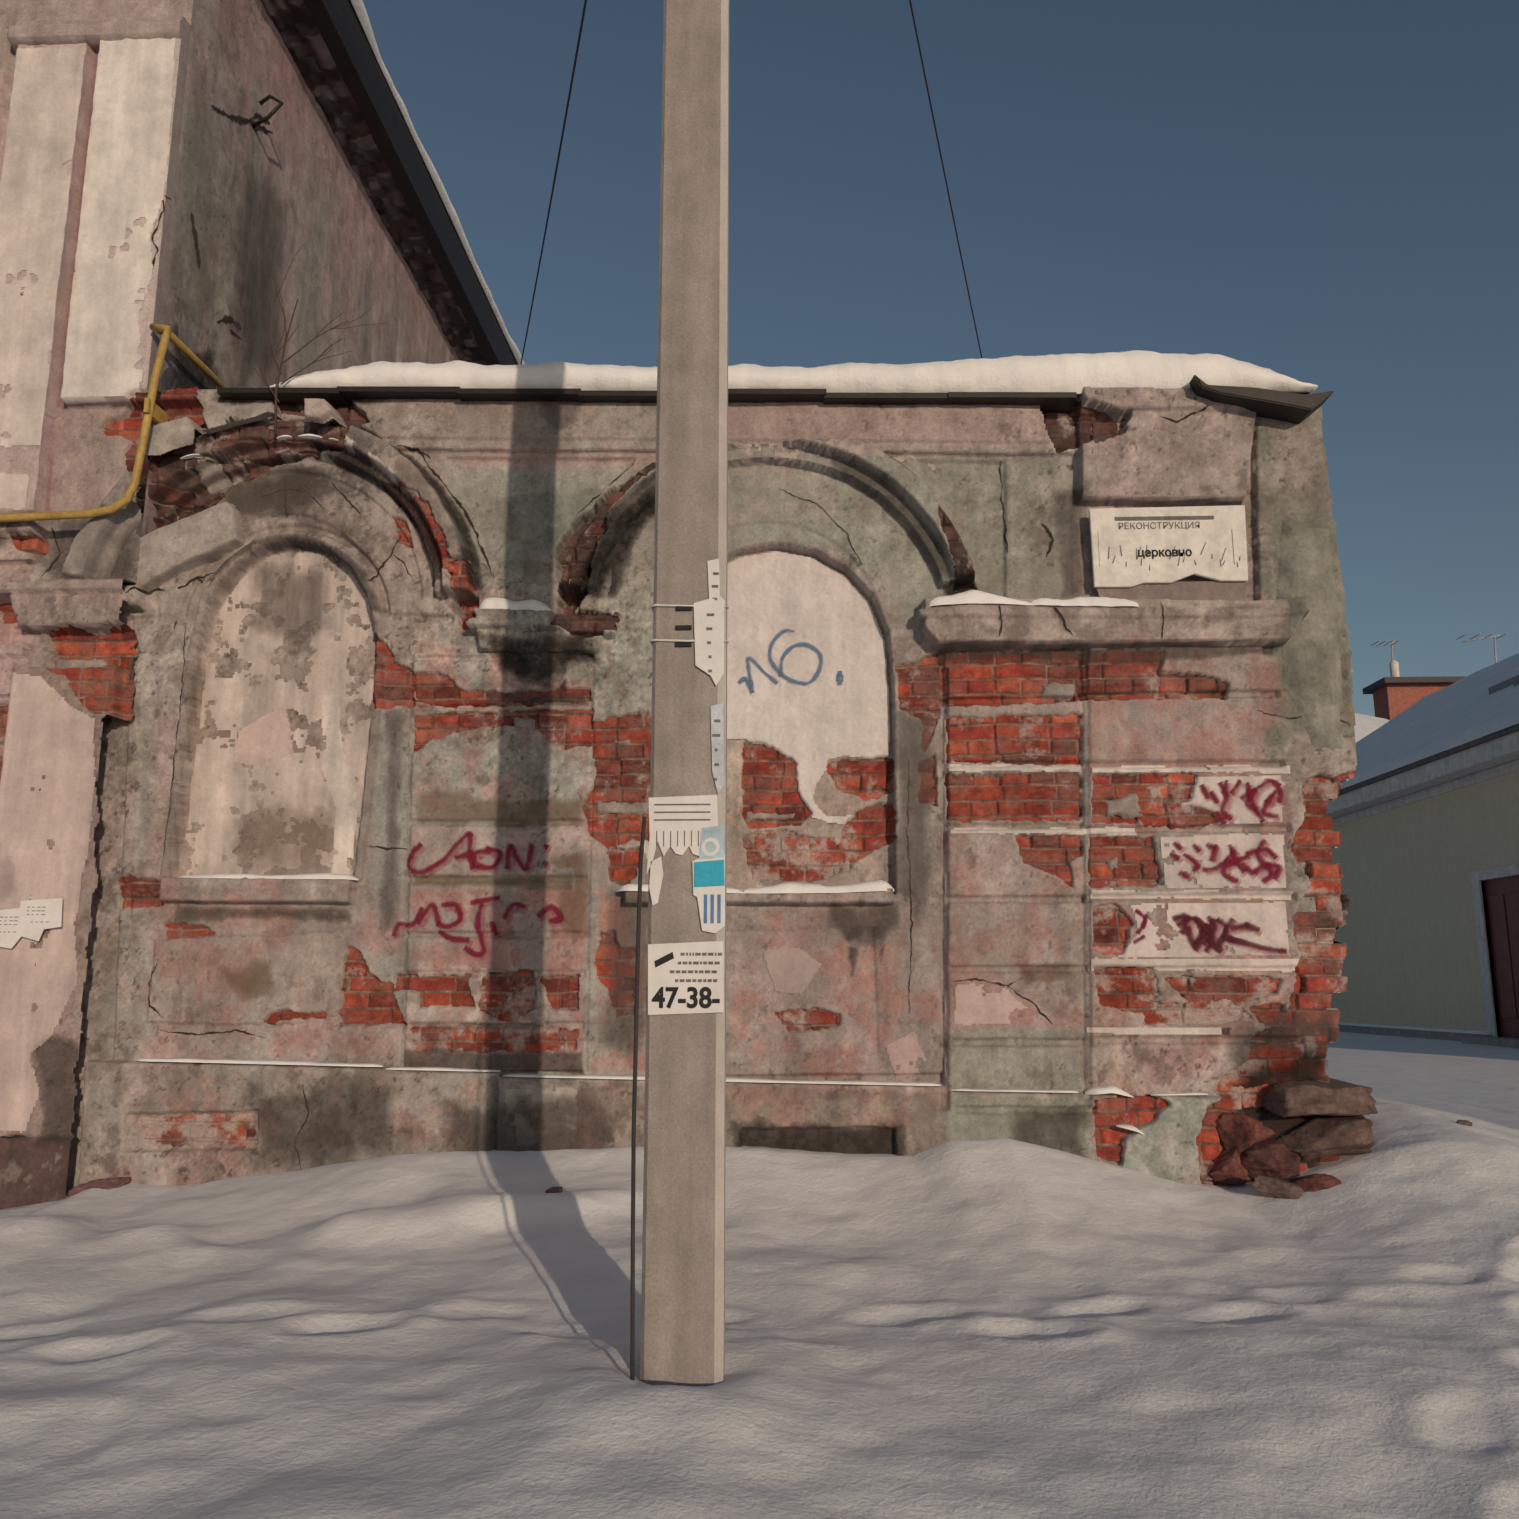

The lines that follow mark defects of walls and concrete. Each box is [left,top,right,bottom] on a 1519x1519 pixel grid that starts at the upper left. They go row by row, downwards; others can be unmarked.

peeling [0,38,479,632]
flaking render [1042,400,1125,454]
flaking render [551,462,656,640]
crack [780,489,862,564]
peeling [185,550,651,885]
peeling [0,622,138,1133]
flaking render [727,551,1355,1186]
flaking render [264,931,636,1054]
crack [954,978,1052,1024]